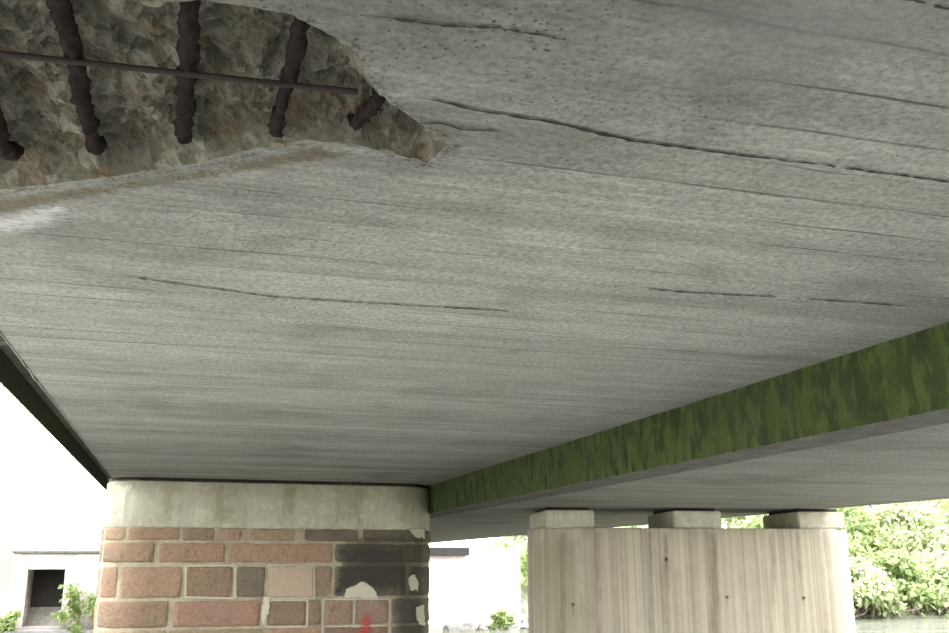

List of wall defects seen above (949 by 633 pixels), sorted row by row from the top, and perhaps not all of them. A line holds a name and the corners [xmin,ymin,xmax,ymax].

spalling [0,0,453,193]